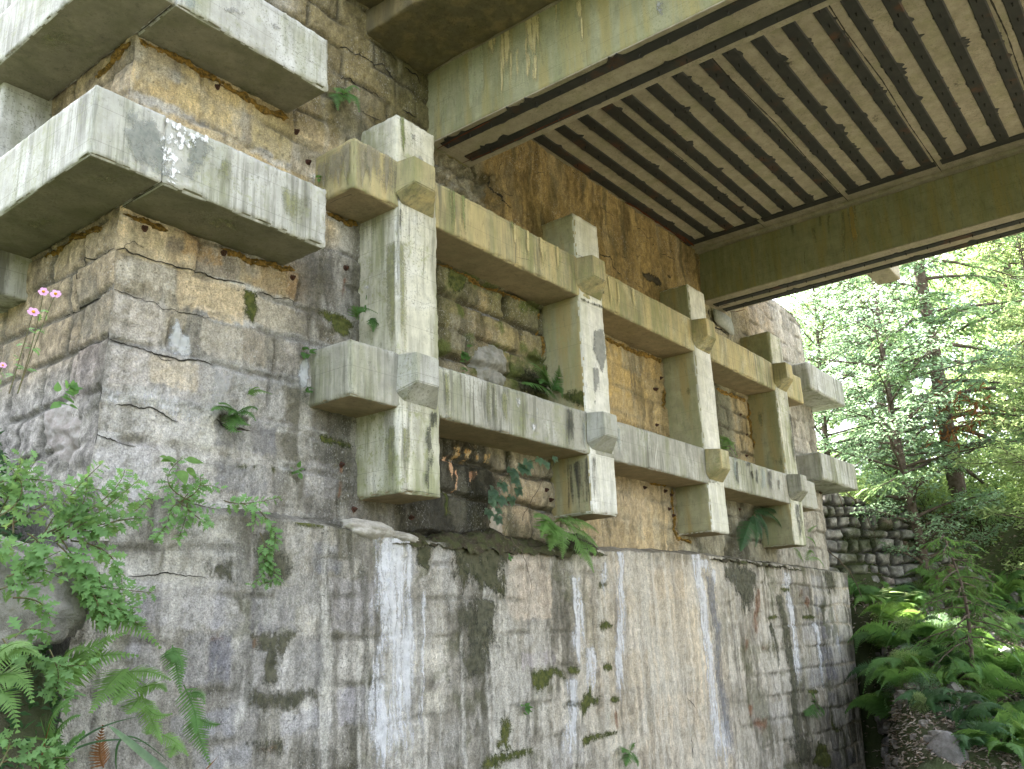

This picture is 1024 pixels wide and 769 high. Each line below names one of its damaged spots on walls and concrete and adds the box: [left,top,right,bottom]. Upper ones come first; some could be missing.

crack [339,47,420,121]
water stain [126,113,169,176]
water stain [185,137,213,178]
crack [65,241,295,318]
crack [81,339,211,365]
crack [116,404,178,422]
crack [128,572,208,580]
water stain [368,538,517,766]
water stain [563,578,597,753]
water stain [601,551,625,689]
water stain [692,554,756,763]
water stain [769,573,813,766]